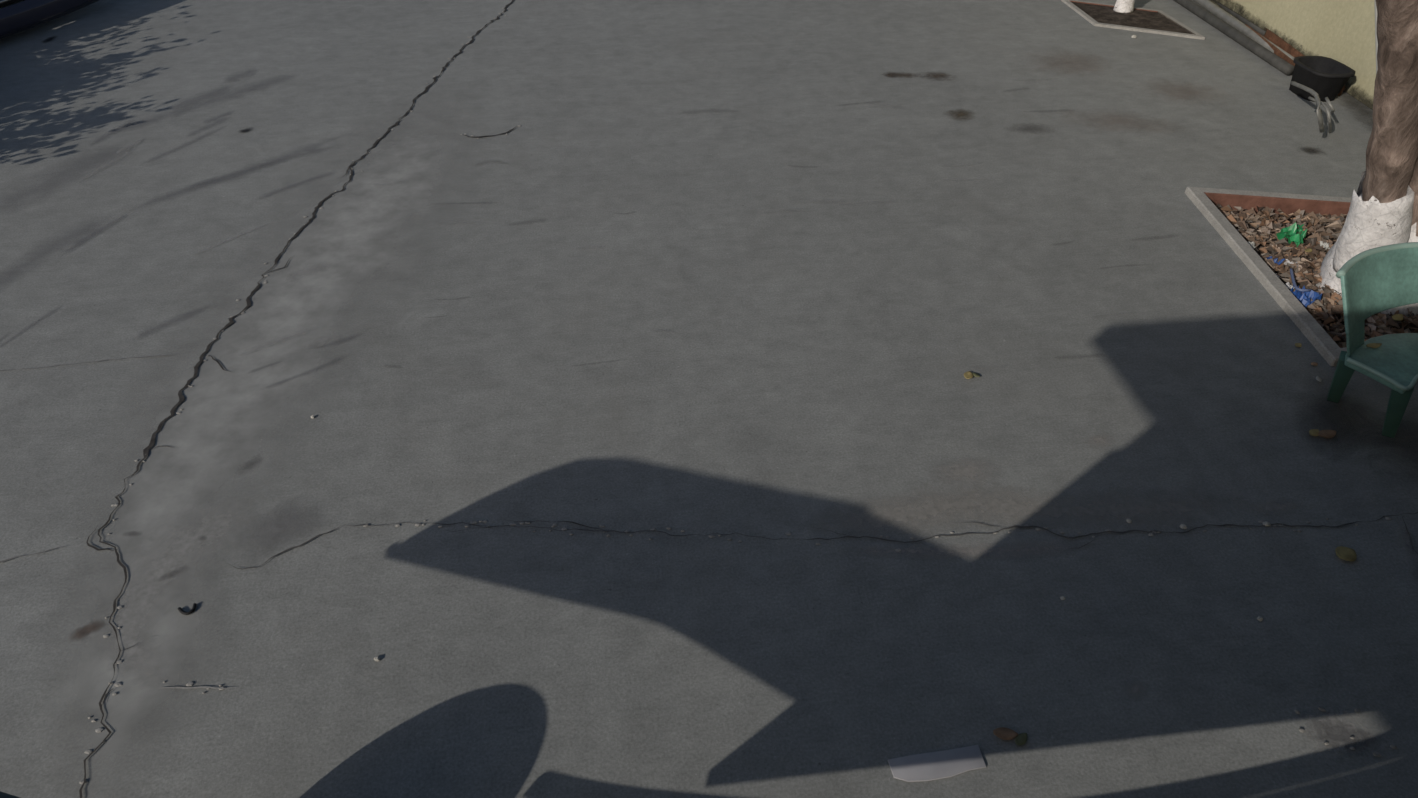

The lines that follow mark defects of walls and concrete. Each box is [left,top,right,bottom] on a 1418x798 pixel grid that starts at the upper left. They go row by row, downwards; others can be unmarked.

crack [0,0,521,798]
crack [231,512,1418,569]